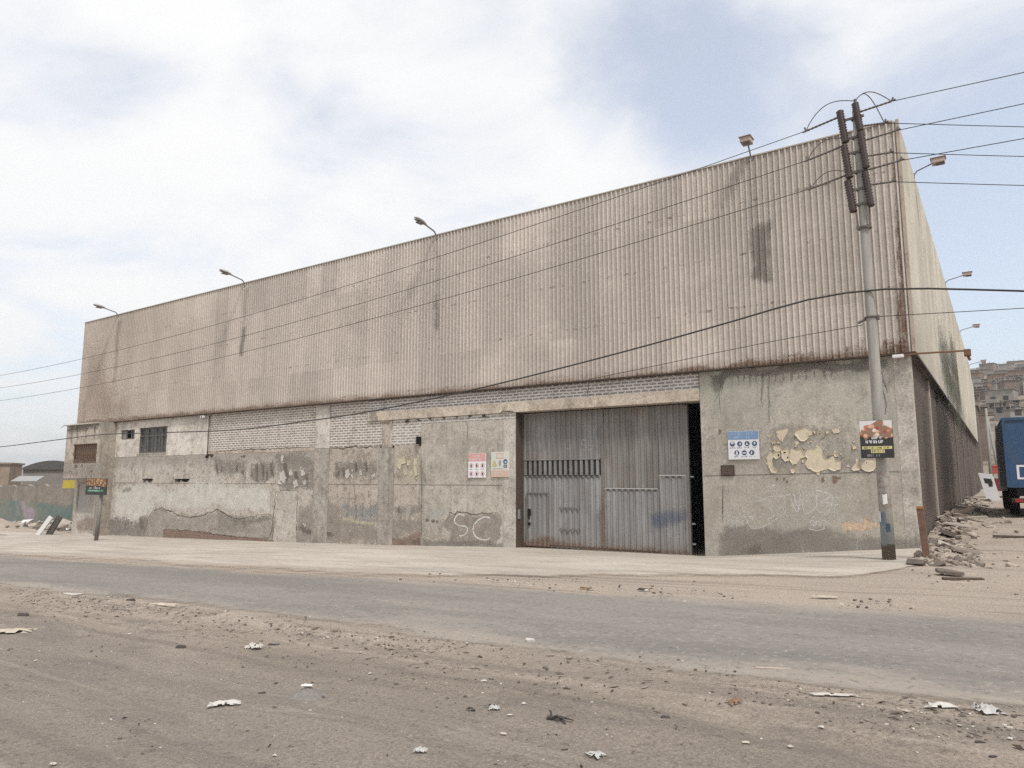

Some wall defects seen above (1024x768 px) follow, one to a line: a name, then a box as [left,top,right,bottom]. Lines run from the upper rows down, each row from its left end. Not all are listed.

water stain [752,224,770,281]
rust [677,194,908,372]
water stain [712,359,885,392]
peeling [764,426,876,475]
peeling [111,446,314,543]
spalling [326,502,377,543]